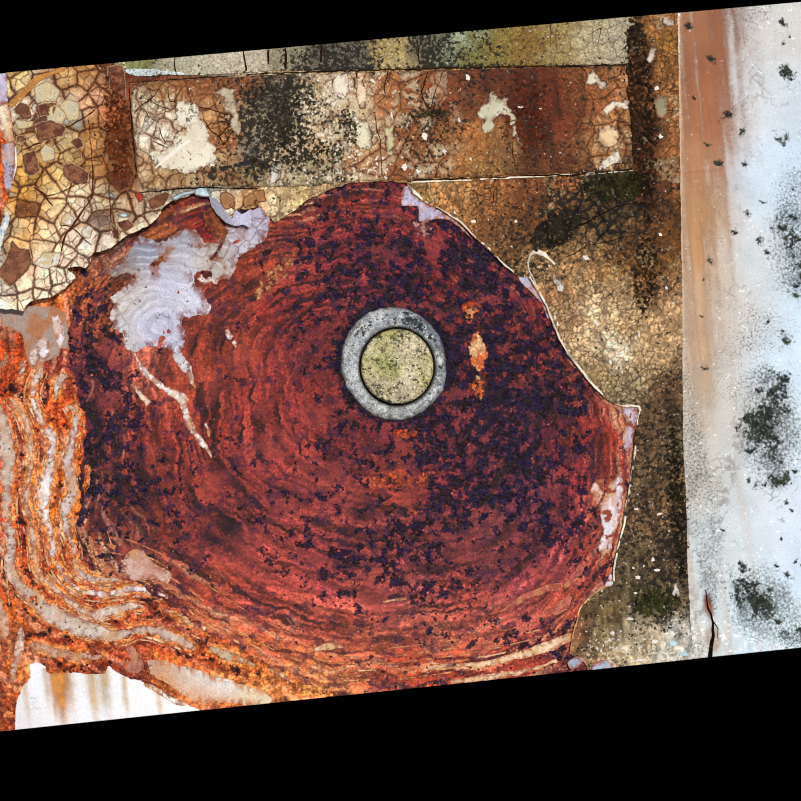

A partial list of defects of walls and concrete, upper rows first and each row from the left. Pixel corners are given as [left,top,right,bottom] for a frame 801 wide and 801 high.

rust [0,130,9,224]
rust [103,72,132,193]
water stain [219,78,361,180]
rust [497,71,552,161]
water stain [578,16,660,318]
rust [680,8,739,402]
water stain [756,188,801,298]
peeling [0,13,692,706]
rust [0,181,637,731]
water stain [734,366,800,490]
crack [704,590,718,657]
water stain [698,543,801,642]